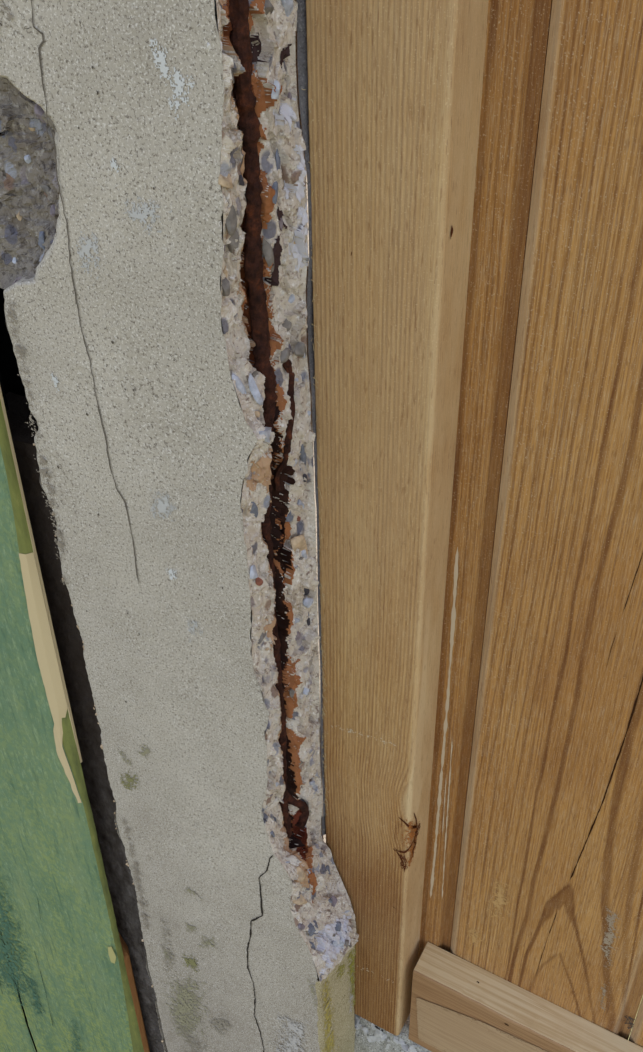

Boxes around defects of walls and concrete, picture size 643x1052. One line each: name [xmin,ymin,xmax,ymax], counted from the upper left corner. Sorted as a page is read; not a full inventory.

spalling [0,76,59,289]
crack [24,0,139,585]
corrosion [237,211,256,366]
corrosion [219,0,282,192]
corrosion [259,170,285,371]
peeling [0,386,82,803]
corrosion [246,384,318,903]
spalling [207,0,359,983]
crack [247,855,273,1052]